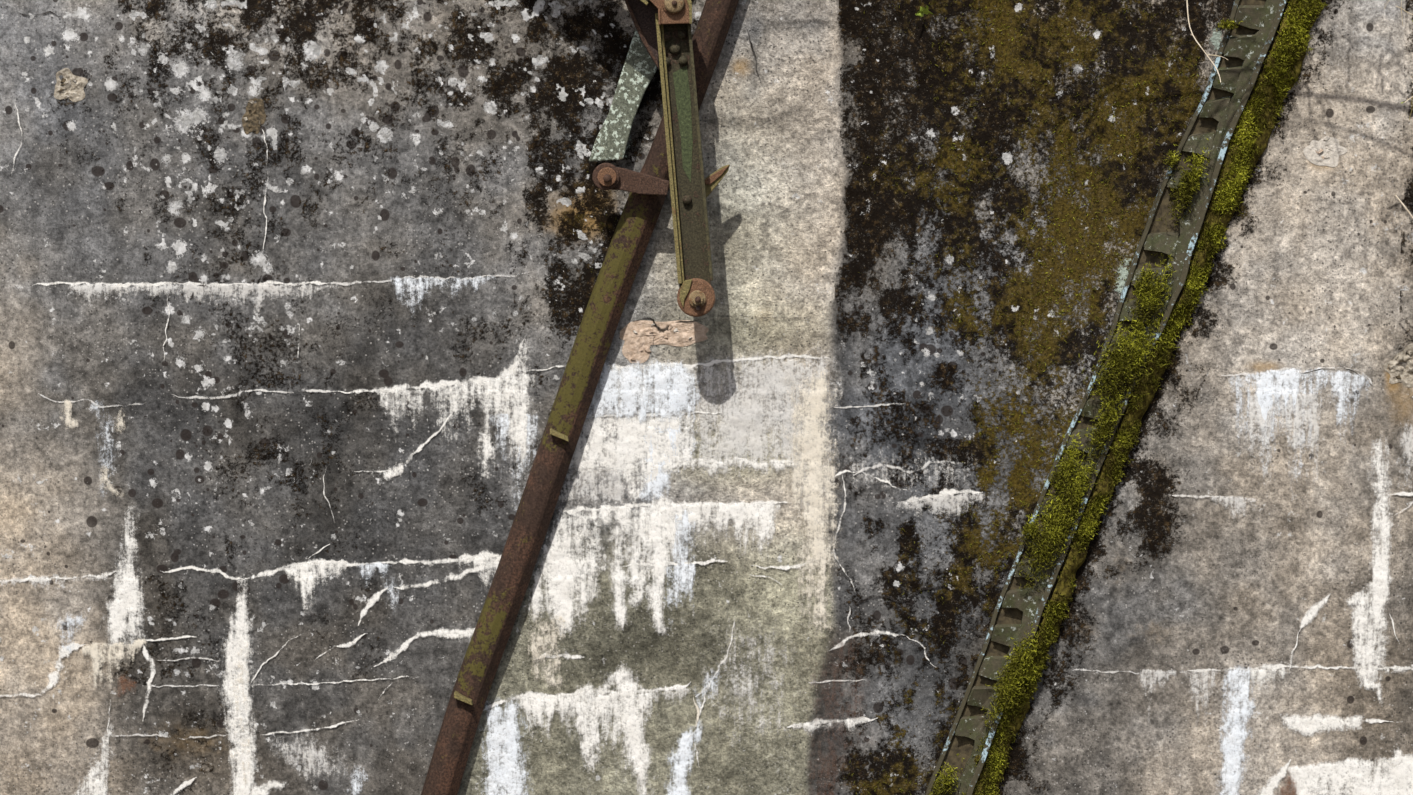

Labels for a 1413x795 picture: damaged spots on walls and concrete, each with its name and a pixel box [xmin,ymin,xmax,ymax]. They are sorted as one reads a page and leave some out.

crack [162,289,170,359]
damp [32,275,515,317]
crack [835,402,890,410]
crack [358,411,454,479]
damp [482,351,838,795]
crack [810,461,954,683]
crack [1290,594,1330,669]
crack [148,657,216,687]
crack [251,633,407,735]
crack [116,732,225,740]